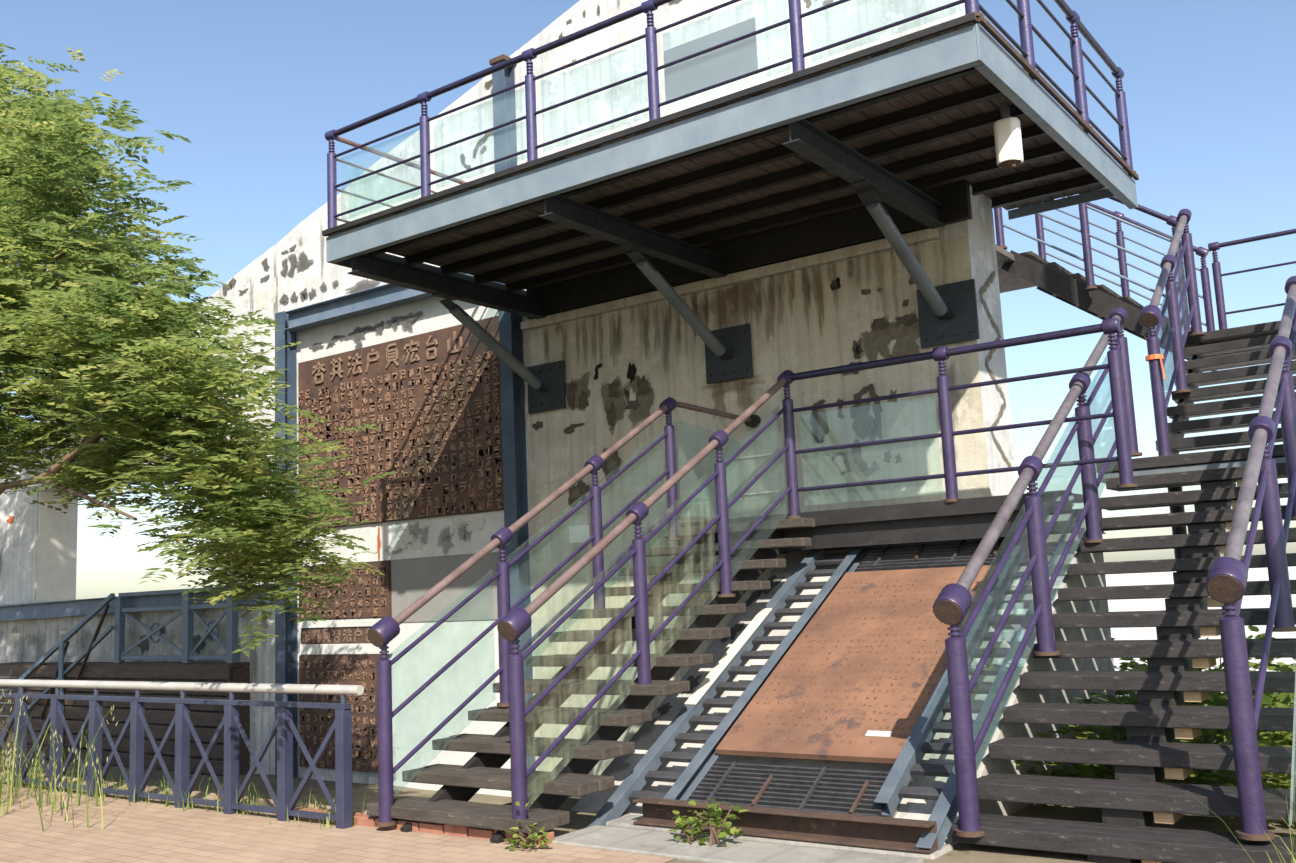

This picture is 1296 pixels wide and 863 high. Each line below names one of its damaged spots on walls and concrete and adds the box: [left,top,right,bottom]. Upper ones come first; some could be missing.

peeling [222,245,379,312]
peeling [309,311,423,352]
spalling [564,363,655,481]
spalling [810,313,920,477]
peeling [568,480,590,507]